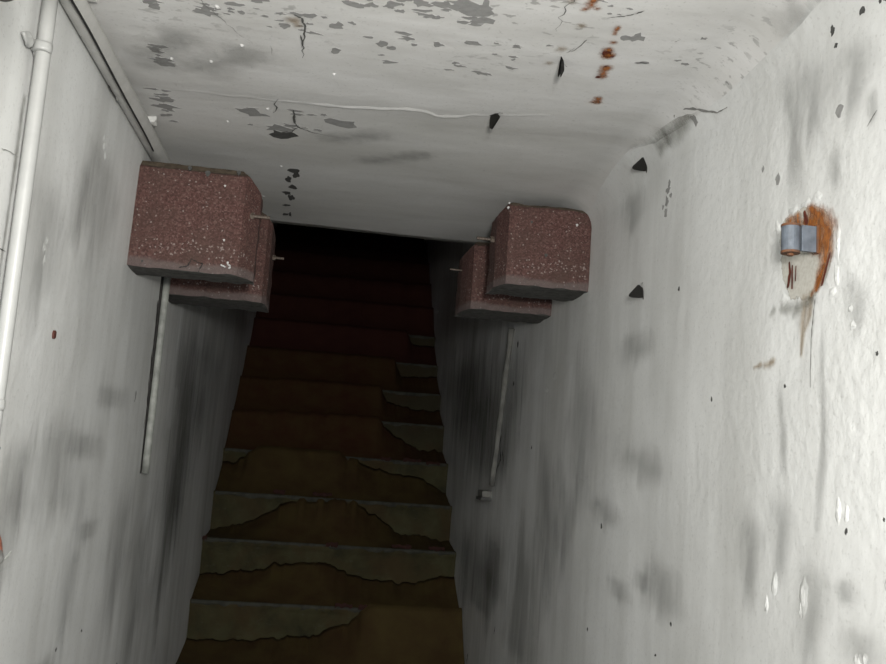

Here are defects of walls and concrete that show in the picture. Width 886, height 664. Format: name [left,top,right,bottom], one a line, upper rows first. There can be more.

peeling [192,0,356,35]
peeling [342,0,495,26]
peeling [363,31,417,64]
rust [595,26,620,78]
peeling [620,32,645,42]
peeling [235,107,357,139]
rust [780,205,835,316]